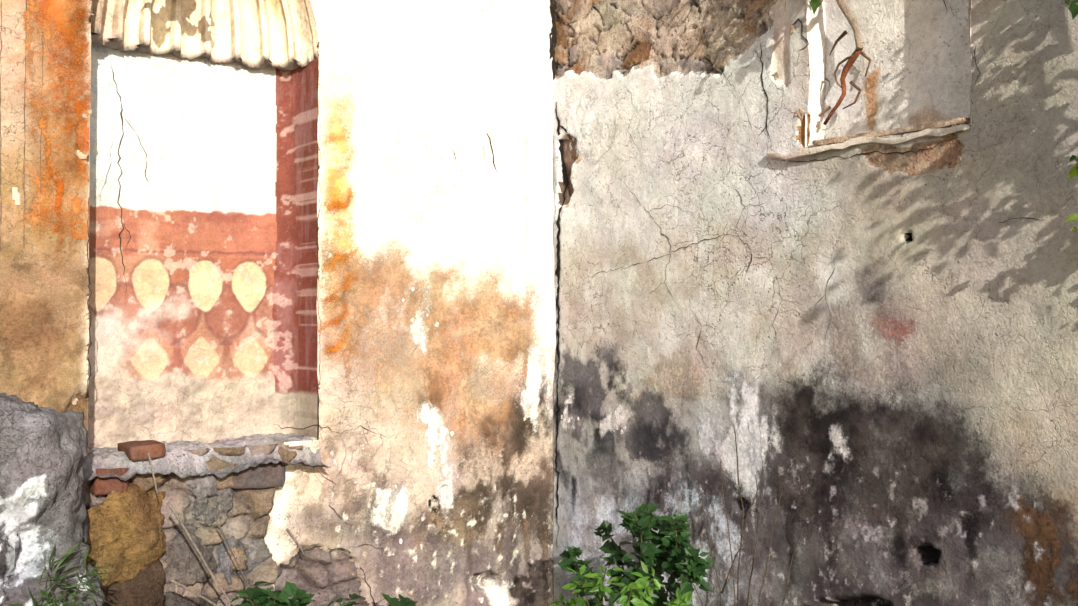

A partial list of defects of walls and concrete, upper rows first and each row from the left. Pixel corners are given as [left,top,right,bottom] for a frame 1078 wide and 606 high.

rust [22,0,91,242]
crack [87,65,149,418]
water stain [318,242,539,453]
flaking render [558,84,619,207]
water stain [634,356,706,400]
water stain [304,370,1078,606]
crack [549,0,835,544]
water stain [828,268,920,386]